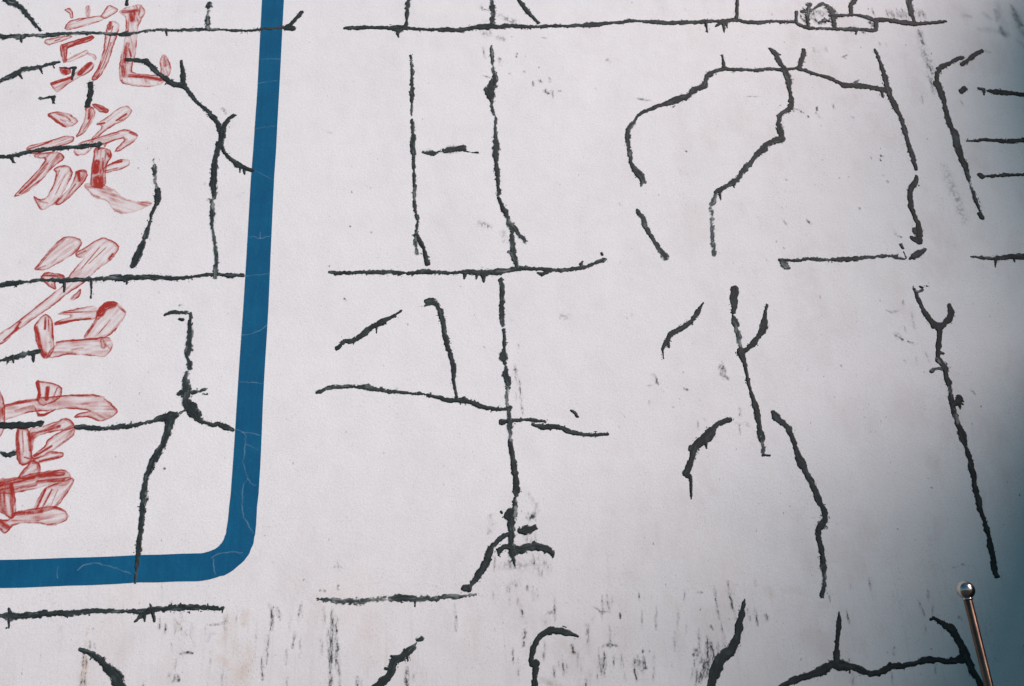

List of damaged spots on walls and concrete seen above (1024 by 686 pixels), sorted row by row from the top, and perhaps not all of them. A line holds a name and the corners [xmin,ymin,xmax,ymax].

crack [0,310,235,629]
crack [0,0,304,299]
crack [315,0,947,607]
crack [682,285,984,686]
crack [913,285,1000,579]
crack [933,49,1024,220]
crack [970,253,1024,267]
crack [528,626,579,686]